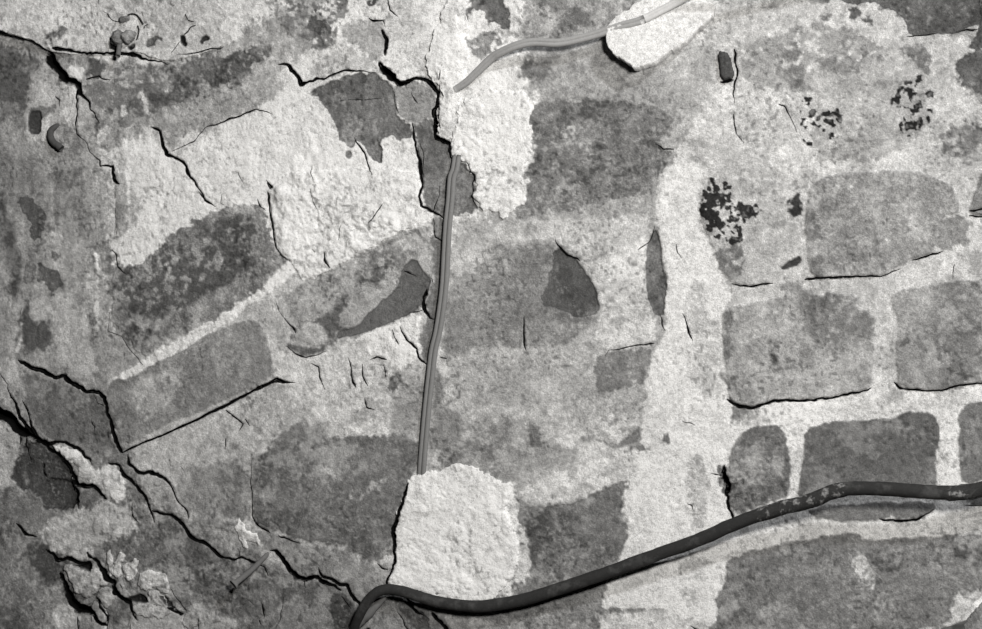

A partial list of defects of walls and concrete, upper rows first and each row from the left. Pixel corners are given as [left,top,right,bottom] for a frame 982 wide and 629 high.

flaking render [109,16,137,51]
crack [46,46,224,184]
crack [152,109,271,207]
crack [279,1,478,241]
crack [257,180,289,261]
crack [276,271,447,410]
crack [520,319,528,350]
spalling [11,440,80,511]
crack [0,360,360,629]
crack [377,482,409,584]
flaking render [63,549,175,623]
crack [398,601,447,629]